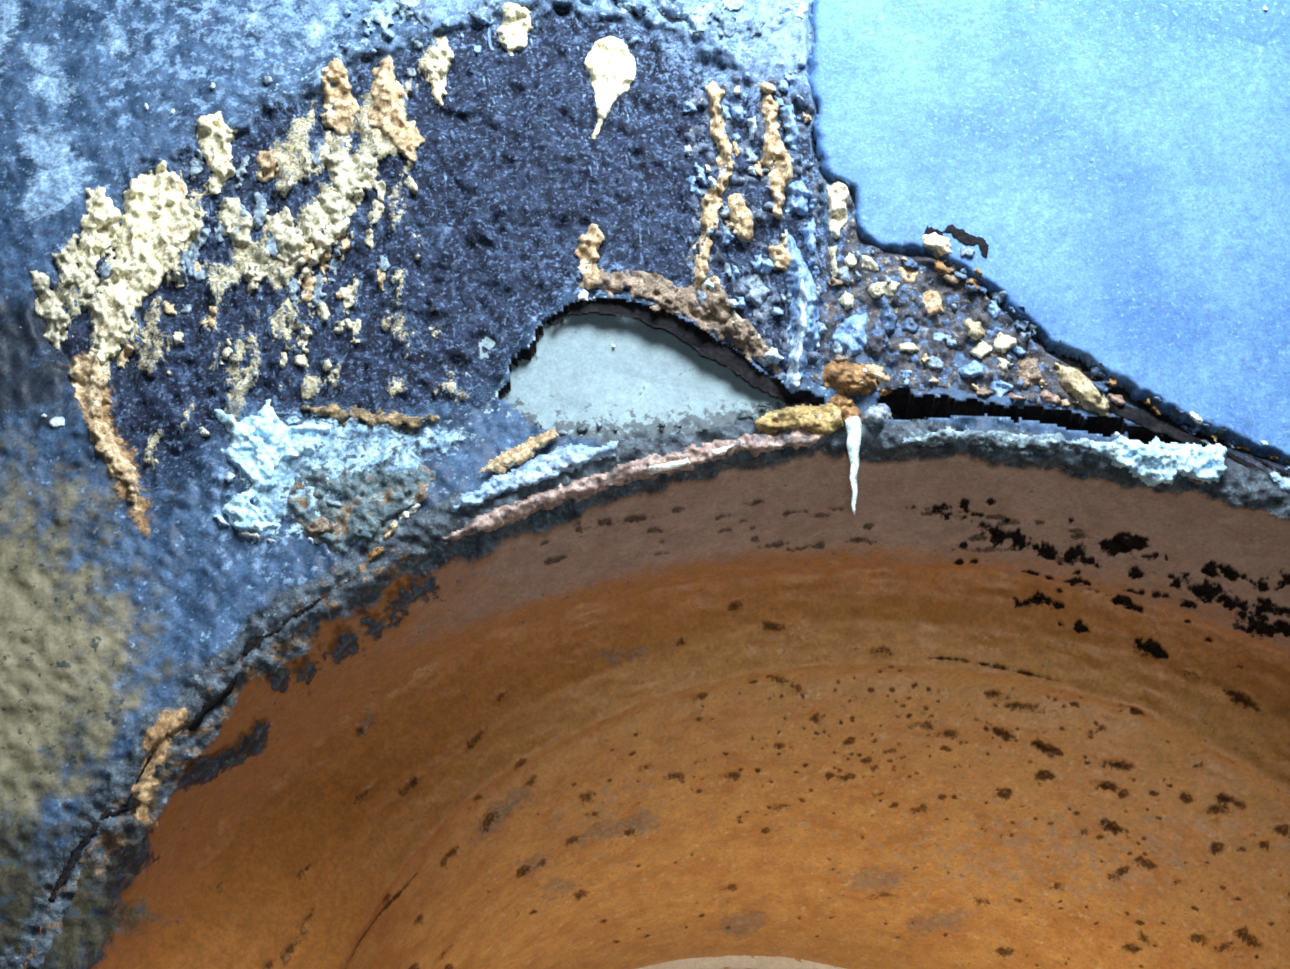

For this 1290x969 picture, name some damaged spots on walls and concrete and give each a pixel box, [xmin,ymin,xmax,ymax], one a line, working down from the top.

spalling [10,0,1125,515]
corrosion [79,387,150,536]
damp [199,399,474,543]
spalling [284,459,436,562]
damp [906,498,1290,640]
damp [1088,432,1227,487]
damp [1270,472,1290,492]
damp [1129,638,1169,659]
crack [48,598,322,902]